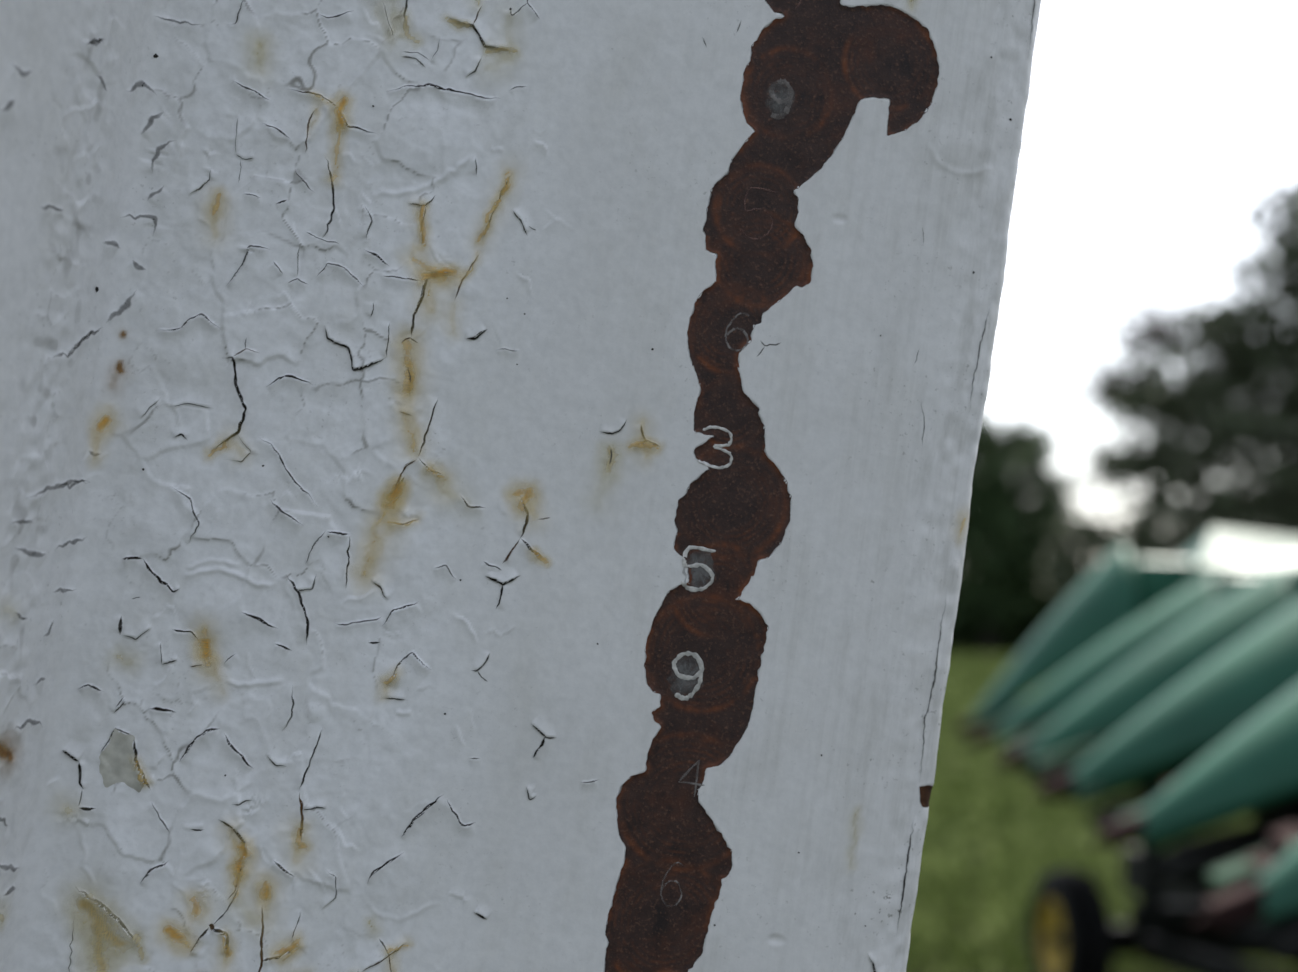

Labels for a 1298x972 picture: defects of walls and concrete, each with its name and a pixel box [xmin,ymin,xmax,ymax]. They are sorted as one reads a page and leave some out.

crack [228,0,255,34]
crack [316,0,540,114]
corrosion [335,97,348,159]
corrosion [478,178,510,241]
corrosion [415,260,456,280]
crack [63,80,548,972]
peeling [99,729,144,793]
crack [526,714,557,800]
corrosion [234,843,249,885]
corrosion [163,926,184,942]